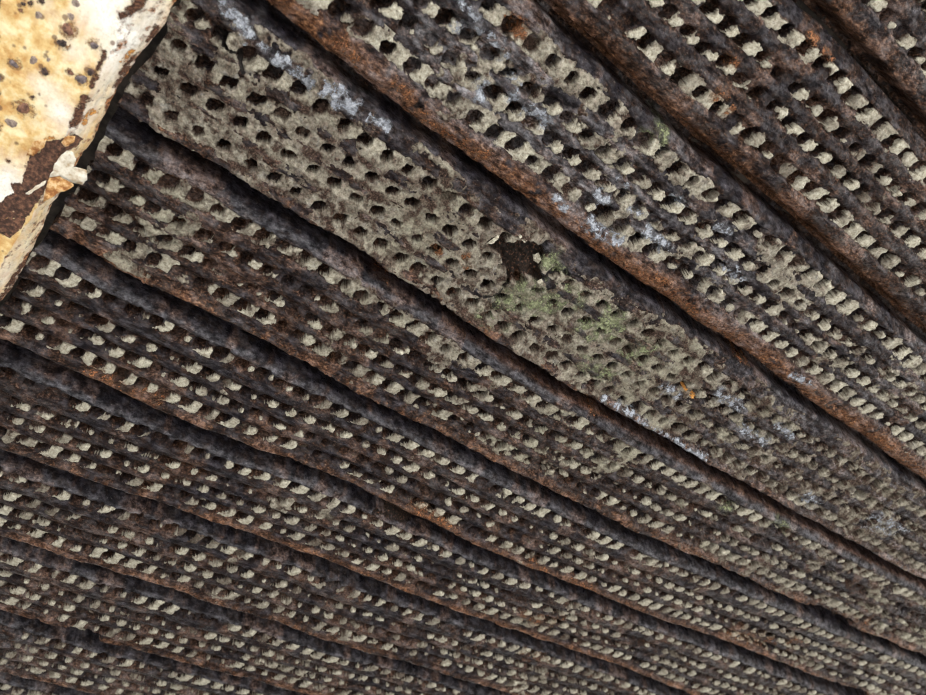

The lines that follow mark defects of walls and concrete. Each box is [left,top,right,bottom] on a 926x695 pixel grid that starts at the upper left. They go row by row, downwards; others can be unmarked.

rust [18,0,45,19]
rust [54,0,80,50]
rust [118,0,148,20]
rust [804,30,835,62]
rust [7,56,50,76]
rust [65,39,107,129]
rust [112,49,135,88]
rust [0,95,36,132]
peeling [0,134,87,238]
rust [0,262,26,301]
rust [592,244,750,368]
rust [372,498,453,530]